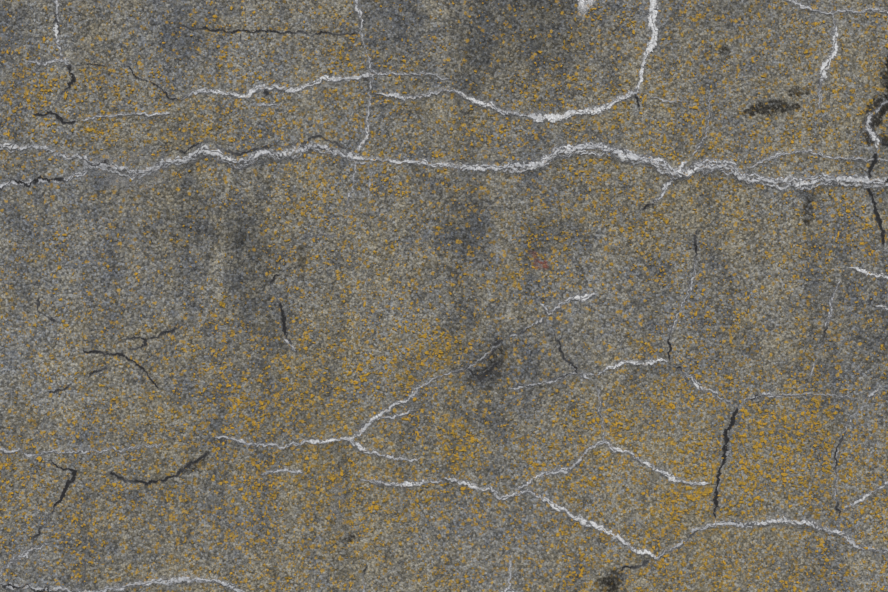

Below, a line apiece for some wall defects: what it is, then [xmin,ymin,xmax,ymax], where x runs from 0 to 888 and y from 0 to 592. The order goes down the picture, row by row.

crack [0,0,888,246]
water stain [861,58,888,147]
crack [0,229,888,592]